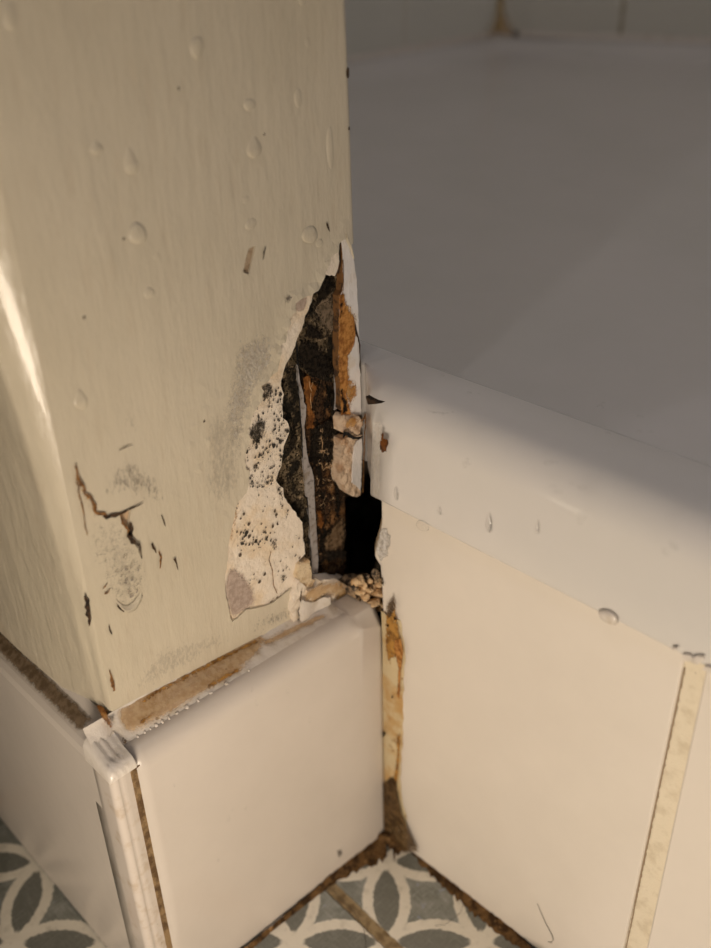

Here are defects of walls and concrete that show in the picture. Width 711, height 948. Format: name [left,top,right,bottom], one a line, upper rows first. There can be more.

spalling [225,243,390,622]
water stain [385,610,404,698]
water stain [383,735,402,828]